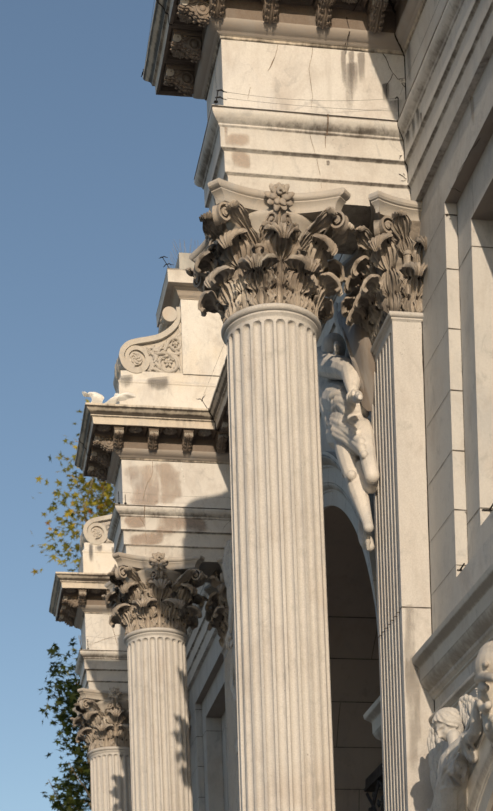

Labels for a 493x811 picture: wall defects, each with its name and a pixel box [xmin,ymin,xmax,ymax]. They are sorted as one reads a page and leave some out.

crack [382,0,406,100]
crack [309,47,329,189]
crack [397,119,411,197]